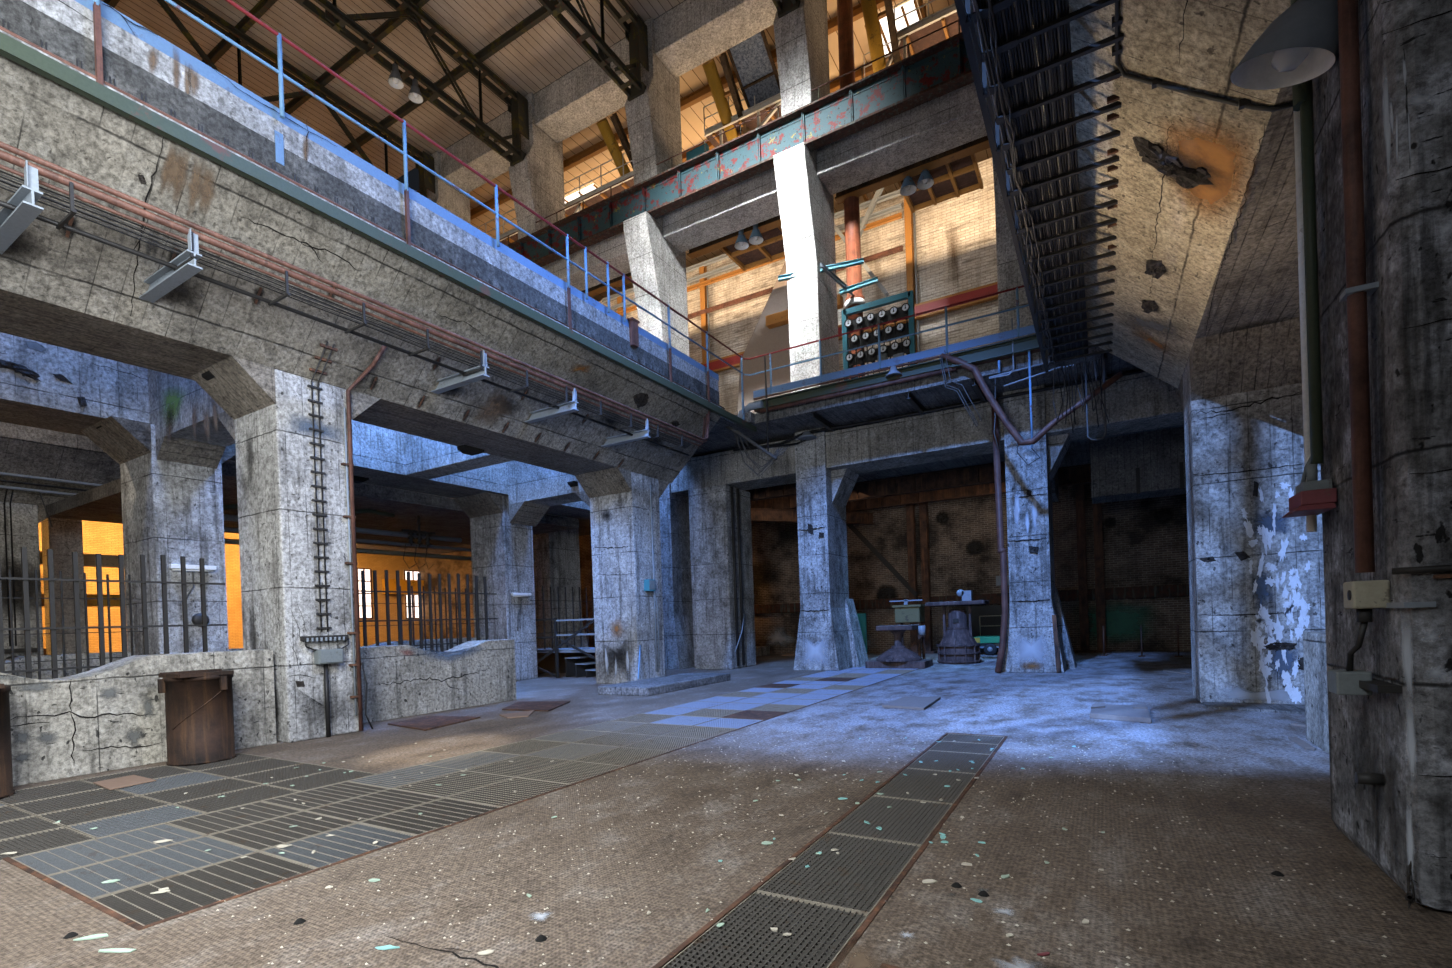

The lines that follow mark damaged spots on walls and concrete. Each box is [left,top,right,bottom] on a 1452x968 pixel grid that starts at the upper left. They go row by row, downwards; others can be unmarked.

spalling [1133,137,1214,189]
rust [1170,128,1241,209]
spalling [0,359,87,407]
peeling [1234,481,1311,704]
crack [386,936,499,968]